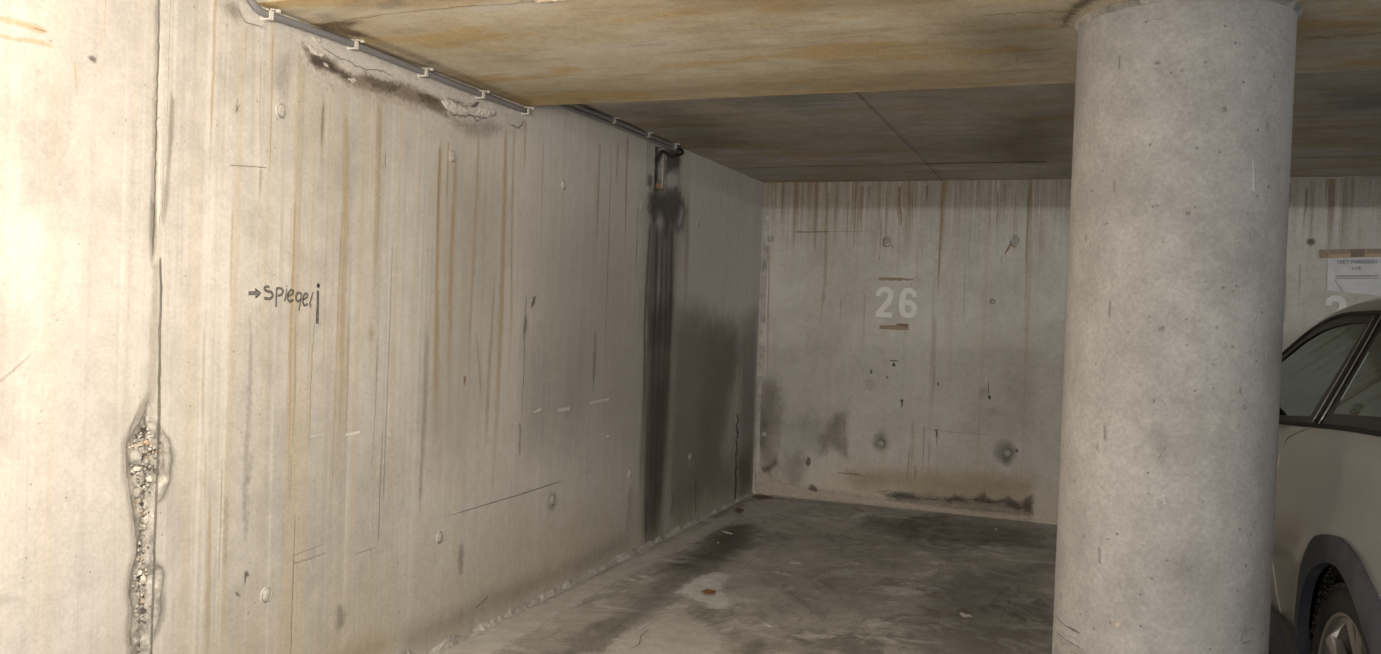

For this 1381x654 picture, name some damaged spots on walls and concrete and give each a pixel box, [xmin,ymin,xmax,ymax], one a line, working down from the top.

spalling [125,400,171,654]
damp [438,150,1032,654]